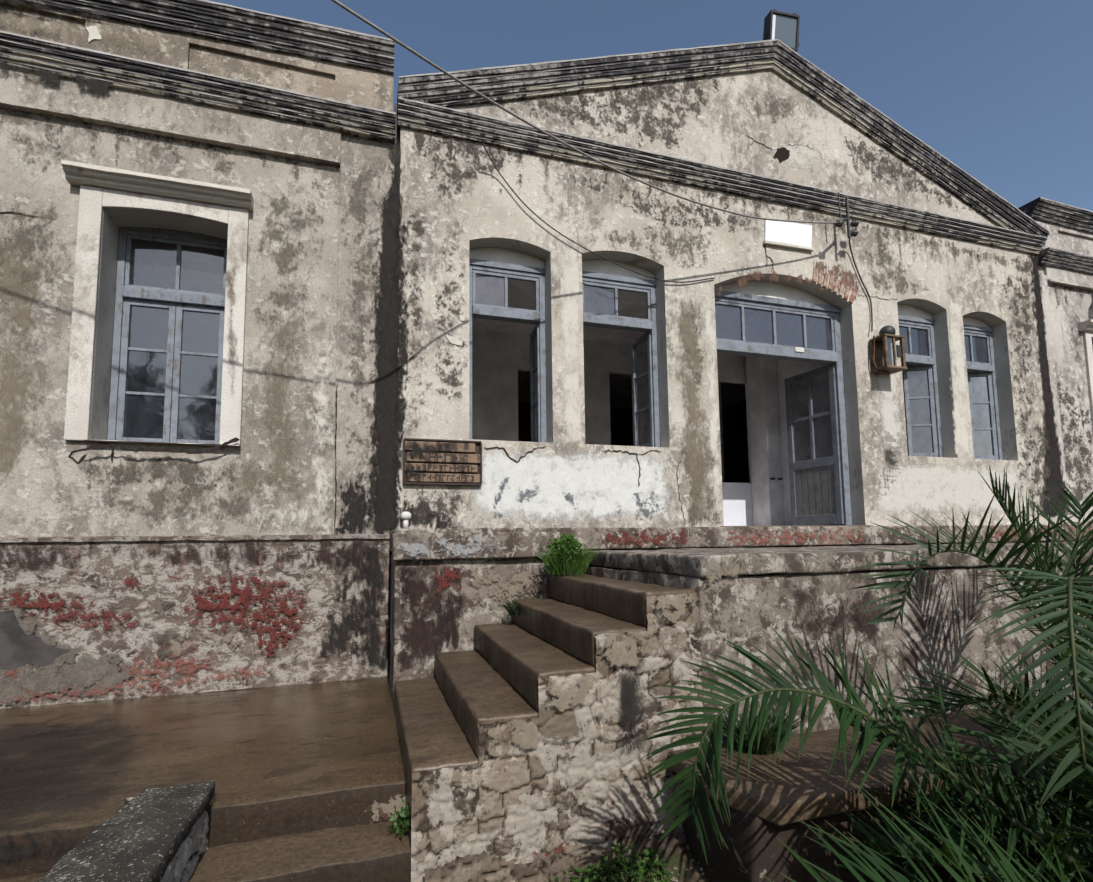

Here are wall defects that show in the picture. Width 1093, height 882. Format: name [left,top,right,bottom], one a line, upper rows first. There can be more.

damp [492,76,718,149]
spalling [772,143,821,168]
flaking render [812,262,863,304]
damp [413,131,1093,527]
damp [82,136,467,672]
crack [484,446,546,463]
crack [605,449,685,521]
damp [0,543,91,569]
peeling [606,528,687,547]
peeling [727,529,865,546]
peeling [0,569,308,703]
damp [795,588,899,644]